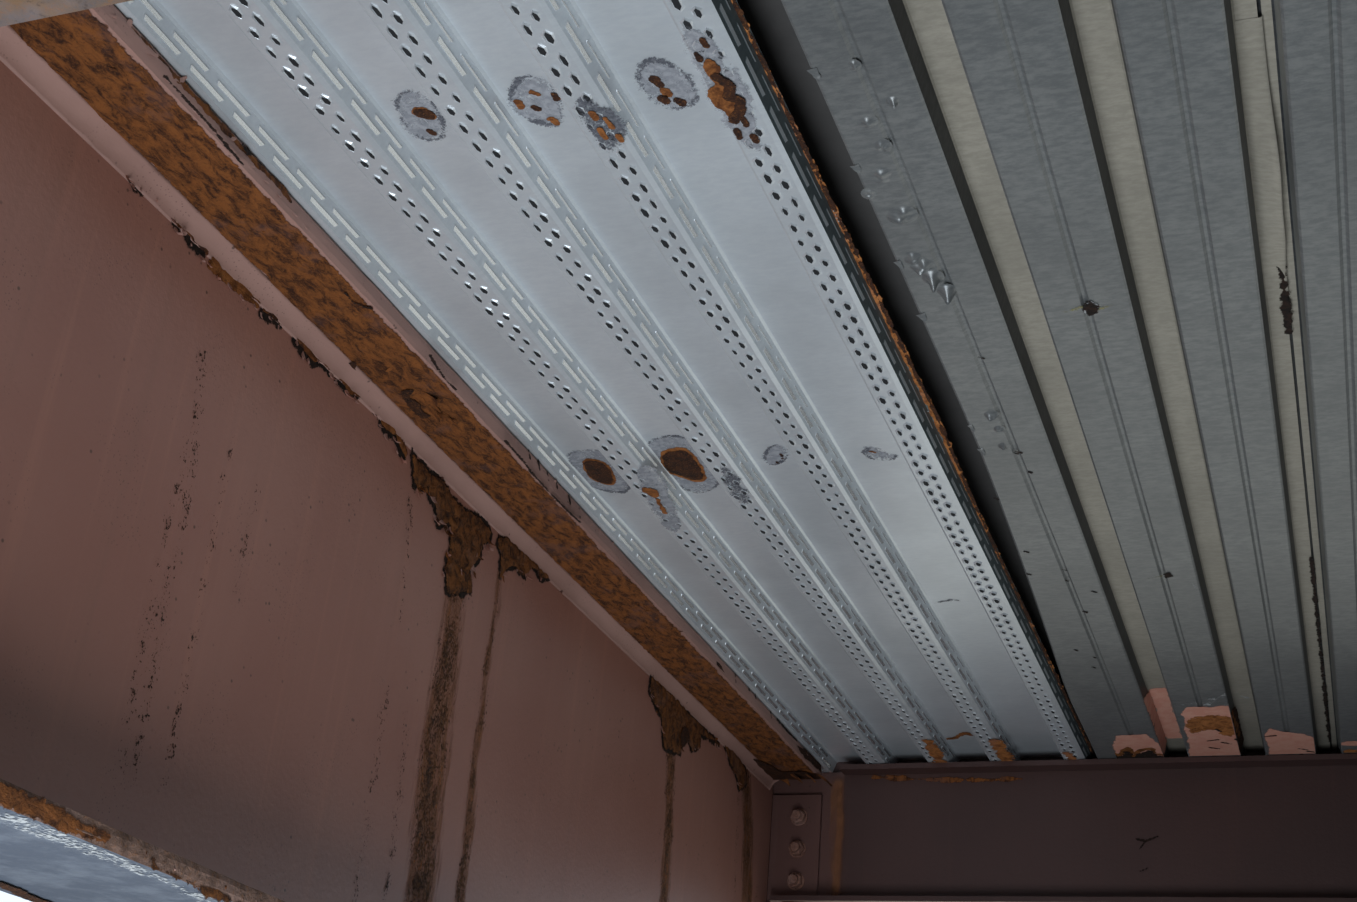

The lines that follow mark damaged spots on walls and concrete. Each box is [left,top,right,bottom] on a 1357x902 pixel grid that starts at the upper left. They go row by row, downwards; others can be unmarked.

corrosion [0,9,832,902]
corrosion [731,0,1096,761]